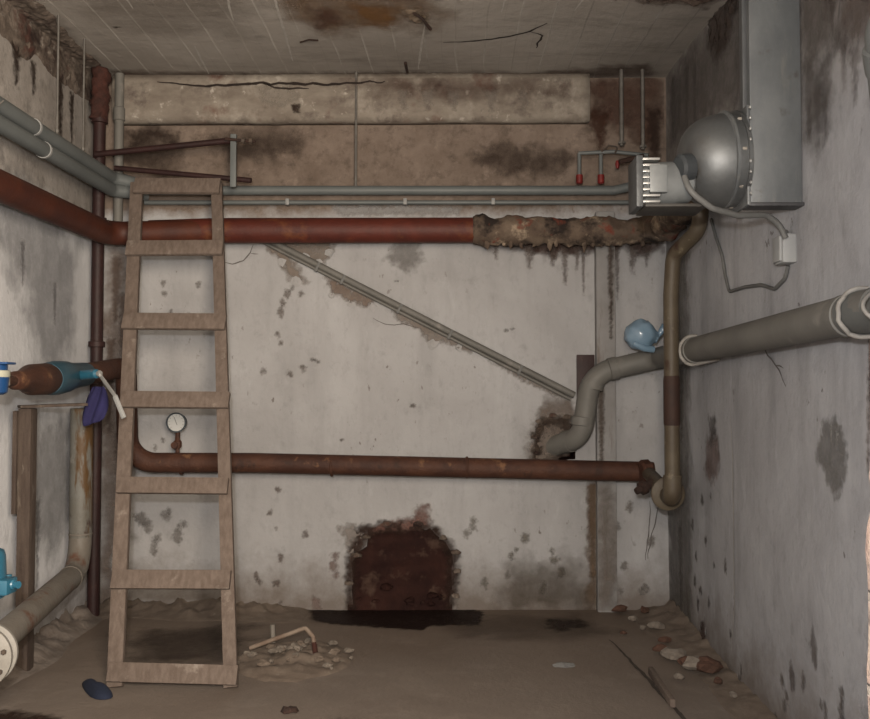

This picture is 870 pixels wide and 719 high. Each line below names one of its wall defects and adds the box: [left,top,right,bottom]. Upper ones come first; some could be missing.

spalling [642,0,739,56]
damp [803,0,870,70]
spalling [0,0,101,143]
crack [159,80,385,90]
spalling [531,413,572,459]
damp [817,419,845,492]
spalling [330,504,461,610]
damp [0,711,56,719]